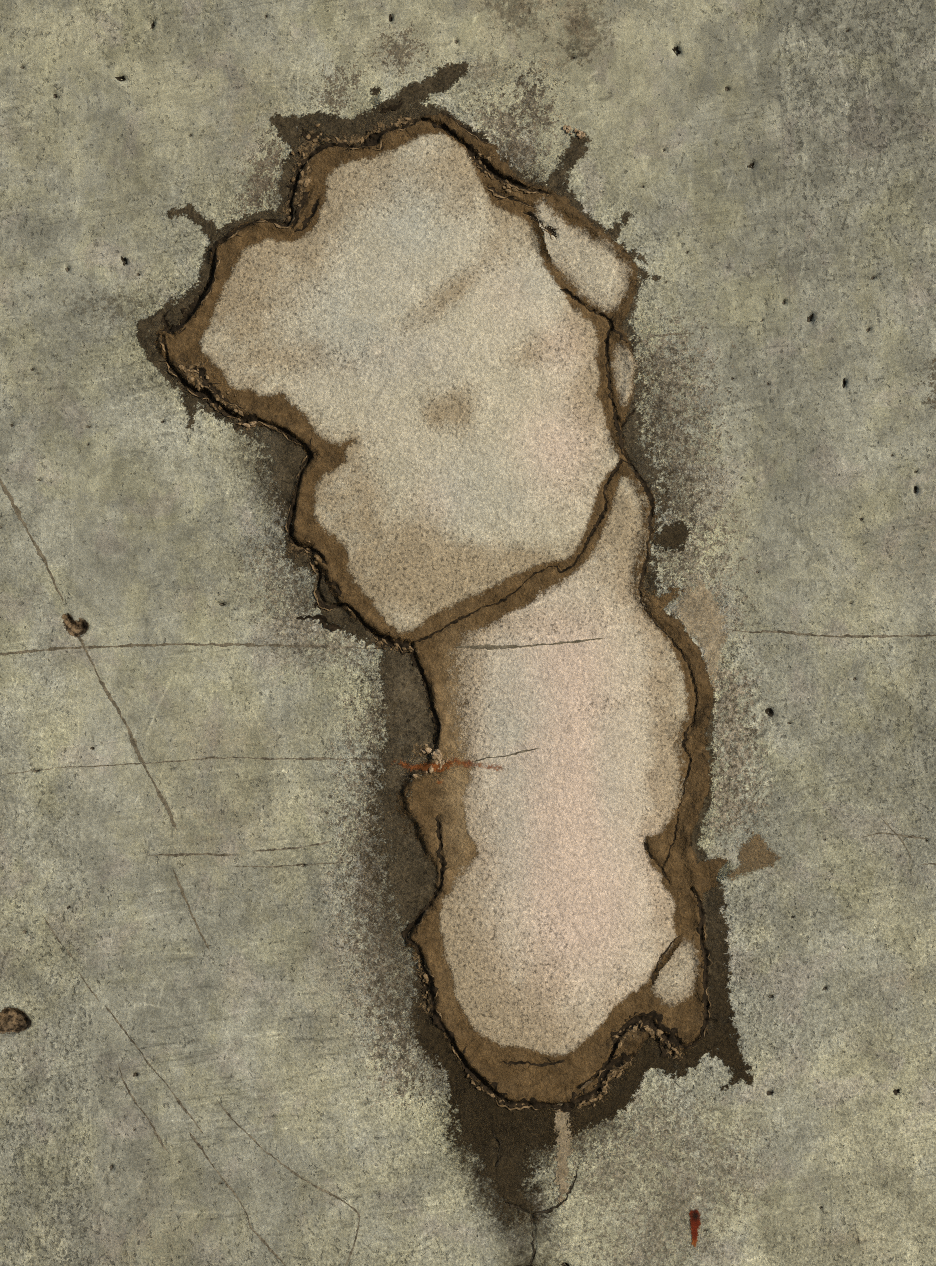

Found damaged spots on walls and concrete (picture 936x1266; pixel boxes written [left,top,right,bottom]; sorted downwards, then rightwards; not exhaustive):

spalling [280,112,419,223]
spalling [452,138,528,193]
spalling [174,358,257,433]
crack [0,99,712,1168]
water stain [135,61,782,1266]
spalling [407,742,449,781]
rust [399,759,502,784]
spalling [411,953,438,1018]
crack [41,913,360,1266]
spalling [577,1019,684,1115]
crack [505,1168,585,1266]
rust [689,1210,701,1247]